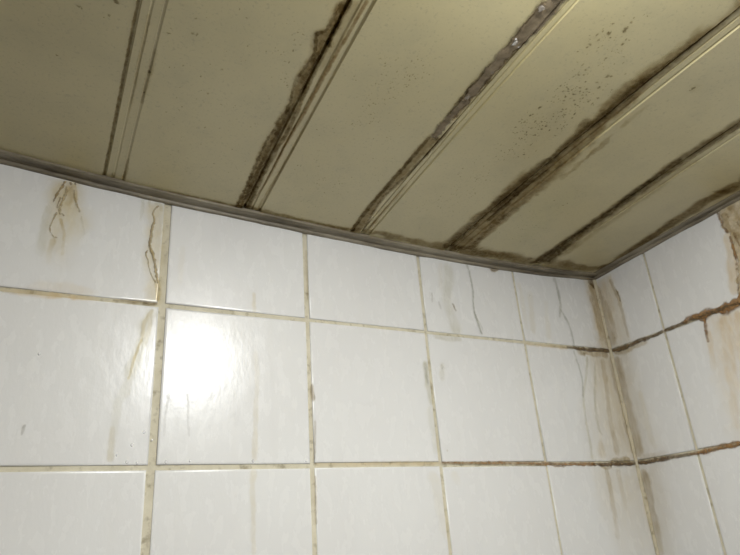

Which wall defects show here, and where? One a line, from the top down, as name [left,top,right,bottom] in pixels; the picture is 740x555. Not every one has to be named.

damp [274,0,352,157]
damp [424,0,565,157]
damp [540,125,739,261]
rust [567,294,740,352]
rust [442,441,740,467]